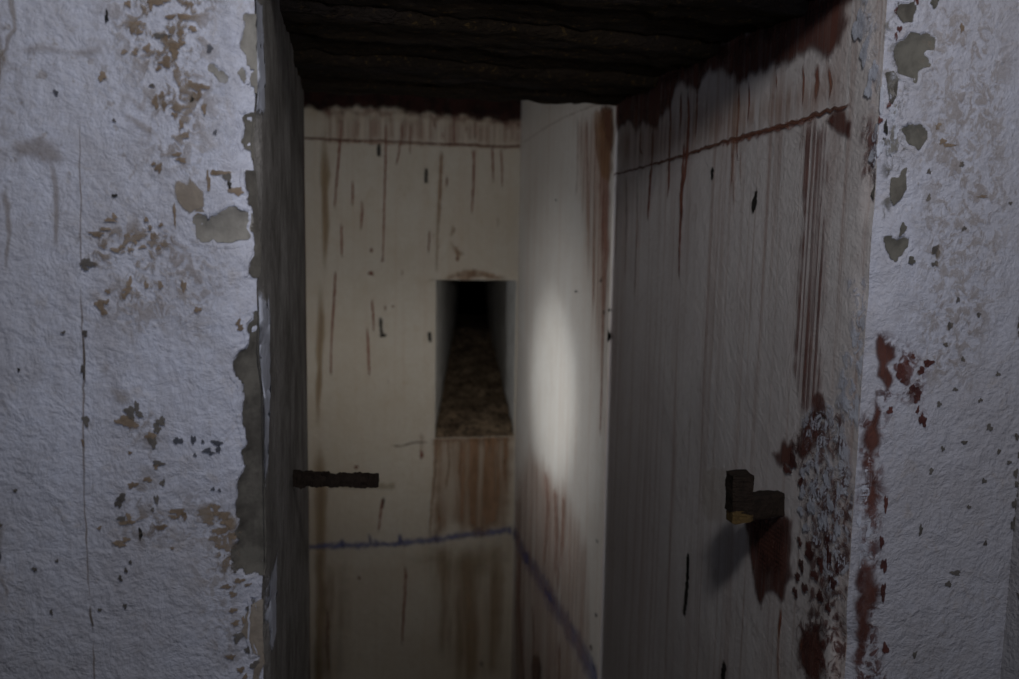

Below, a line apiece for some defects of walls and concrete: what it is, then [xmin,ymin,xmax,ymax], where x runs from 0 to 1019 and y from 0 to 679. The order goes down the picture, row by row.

peeling [94,276,132,316]
spalling [79,0,266,278]
rust [304,92,521,144]
rust [576,0,851,349]
rust [775,128,825,466]
spalling [878,222,916,268]
spalling [852,0,956,208]
spalling [112,295,278,679]
rust [420,437,509,535]
rust [746,516,792,632]
rust [798,616,841,679]
rust [839,280,929,679]